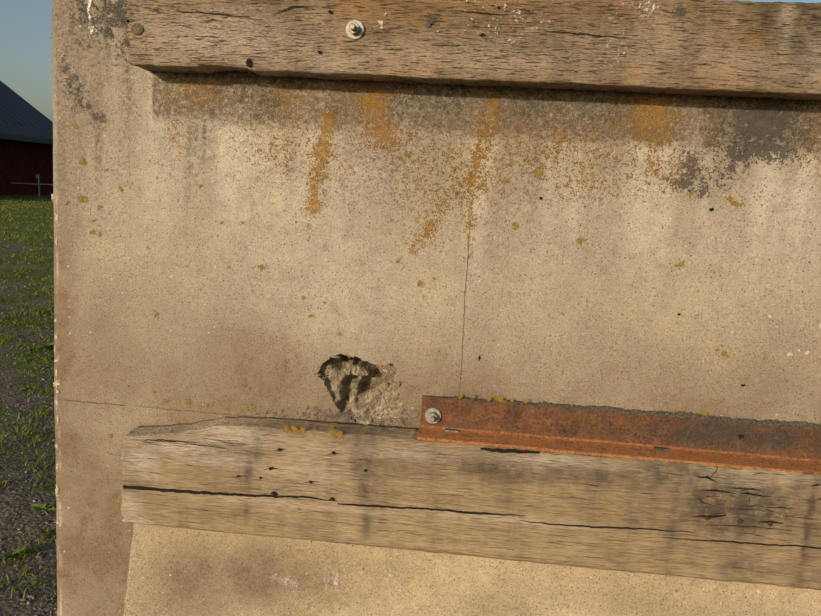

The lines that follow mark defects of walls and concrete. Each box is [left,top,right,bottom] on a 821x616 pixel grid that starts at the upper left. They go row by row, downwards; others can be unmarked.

spalling [313,354,404,425]
crack [459,206,473,391]